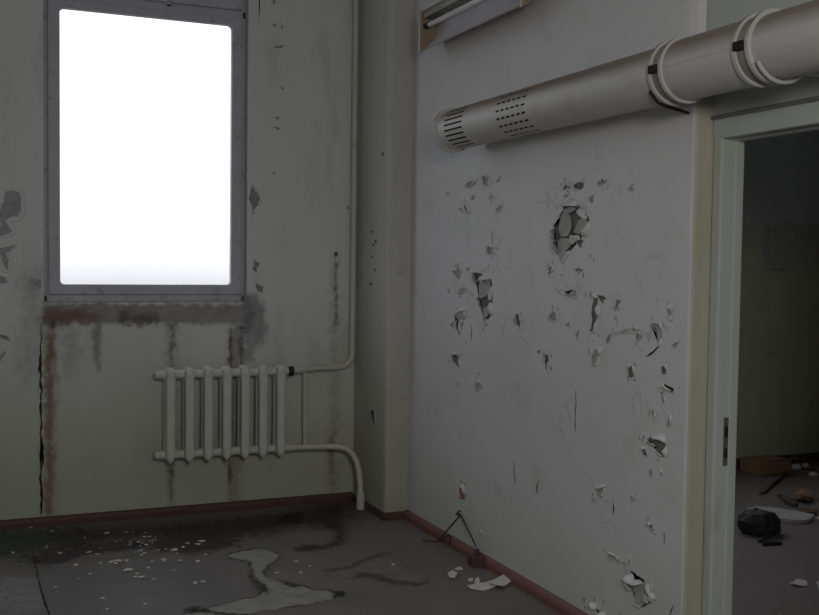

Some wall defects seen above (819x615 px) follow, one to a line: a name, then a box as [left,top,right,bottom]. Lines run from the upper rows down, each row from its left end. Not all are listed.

peeling [0,188,26,284]
peeling [547,177,674,367]
crack [31,539,50,615]
water stain [0,503,351,615]